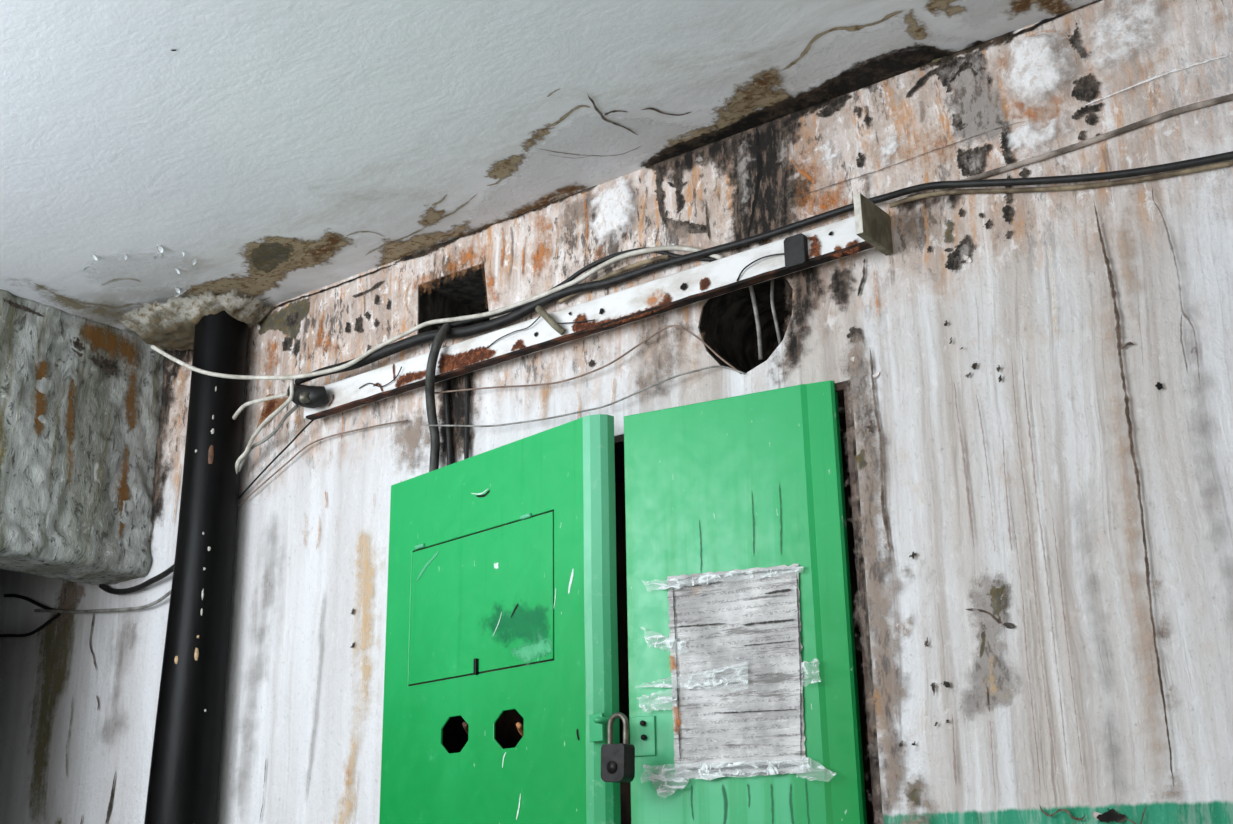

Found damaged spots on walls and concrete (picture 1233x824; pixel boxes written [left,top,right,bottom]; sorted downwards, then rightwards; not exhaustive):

damp [1010,0,1071,20]
peeling [655,136,735,181]
damp [664,0,965,253]
crack [587,0,1101,240]
crack [1086,56,1227,105]
damp [174,195,470,300]
peeling [368,195,476,254]
corrosion [34,360,47,437]
corrosion [70,323,139,430]
corrosion [373,346,495,392]
corrosion [117,445,129,538]
crack [1094,148,1180,796]